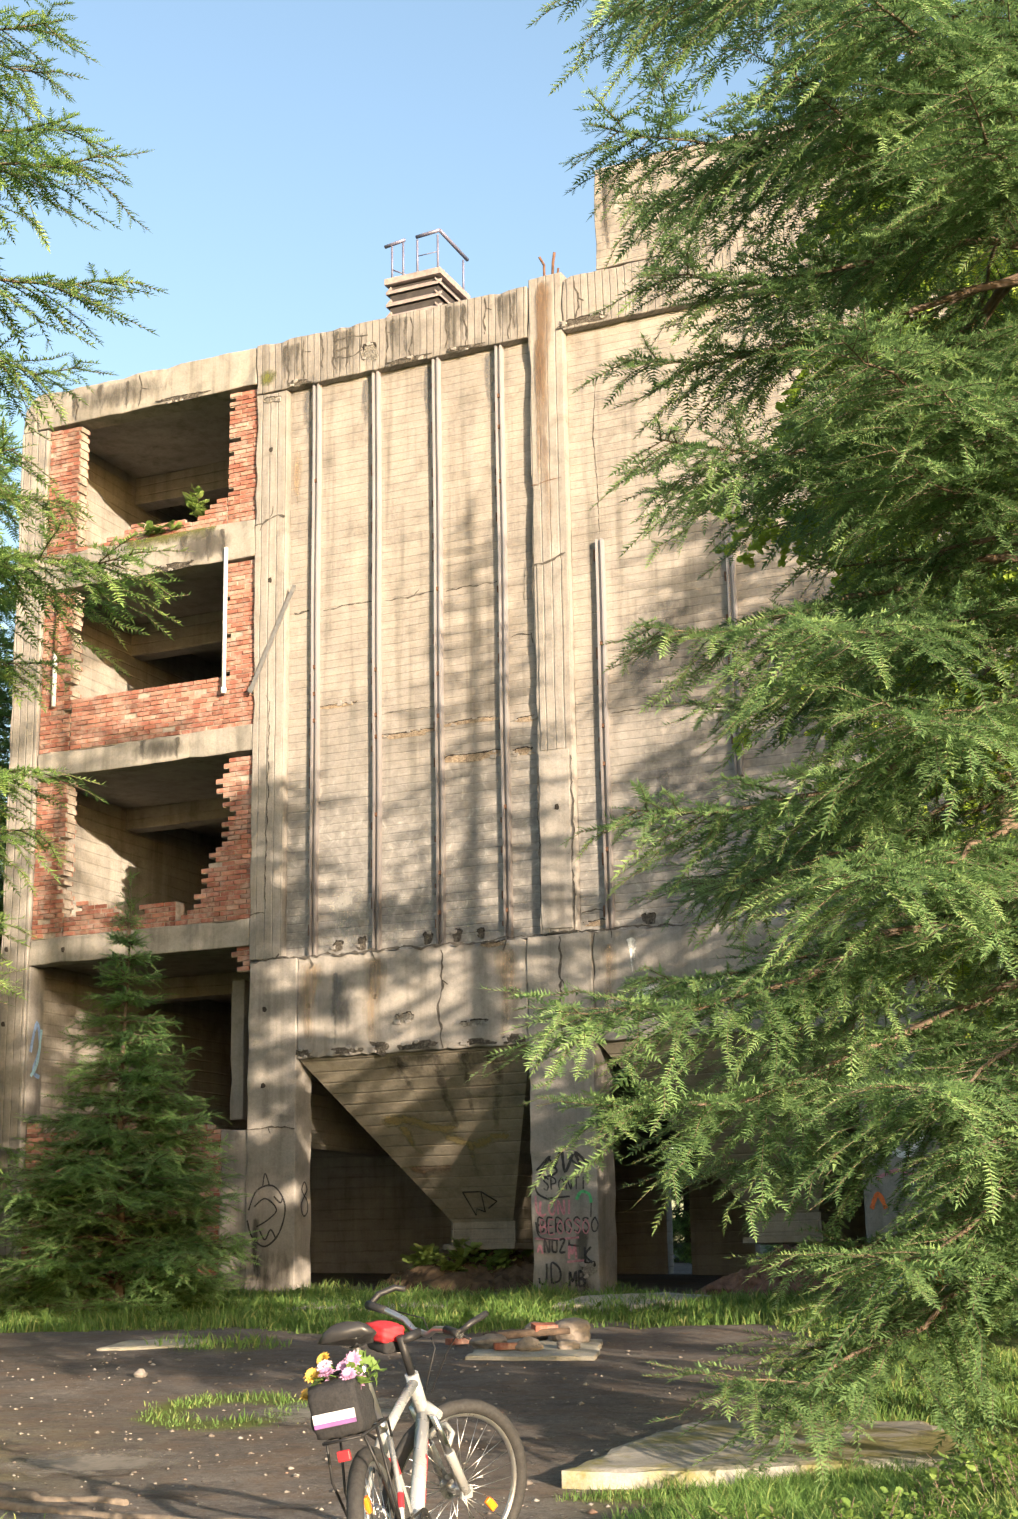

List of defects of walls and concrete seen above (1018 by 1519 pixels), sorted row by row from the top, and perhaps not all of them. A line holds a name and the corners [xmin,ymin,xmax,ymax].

corrosion [536,285,549,401]
crack [250,696,270,916]
crack [249,755,688,1050]
crack [613,702,687,713]